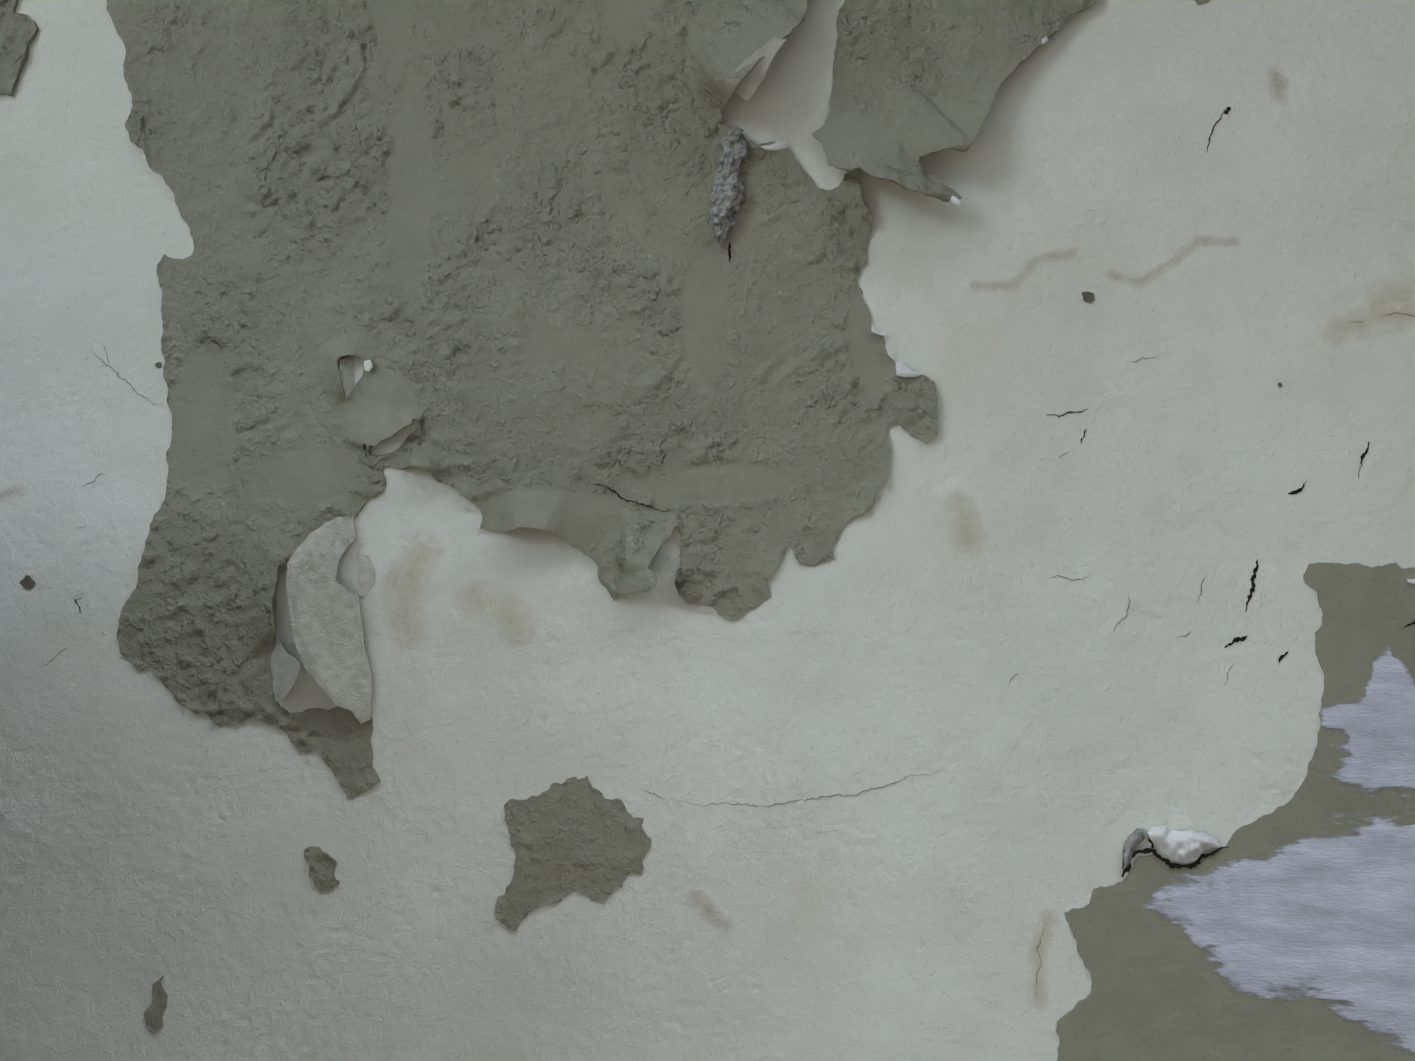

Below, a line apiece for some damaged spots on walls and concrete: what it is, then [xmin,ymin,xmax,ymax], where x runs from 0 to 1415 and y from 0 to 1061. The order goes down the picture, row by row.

peeling [683,0,808,120]
peeling [721,0,1097,206]
peeling [338,355,427,456]
peeling [896,361,918,379]
peeling [398,443,456,489]
peeling [456,458,680,597]
peeling [271,516,375,724]
peeling [494,776,651,931]
peeling [1135,825,1220,865]